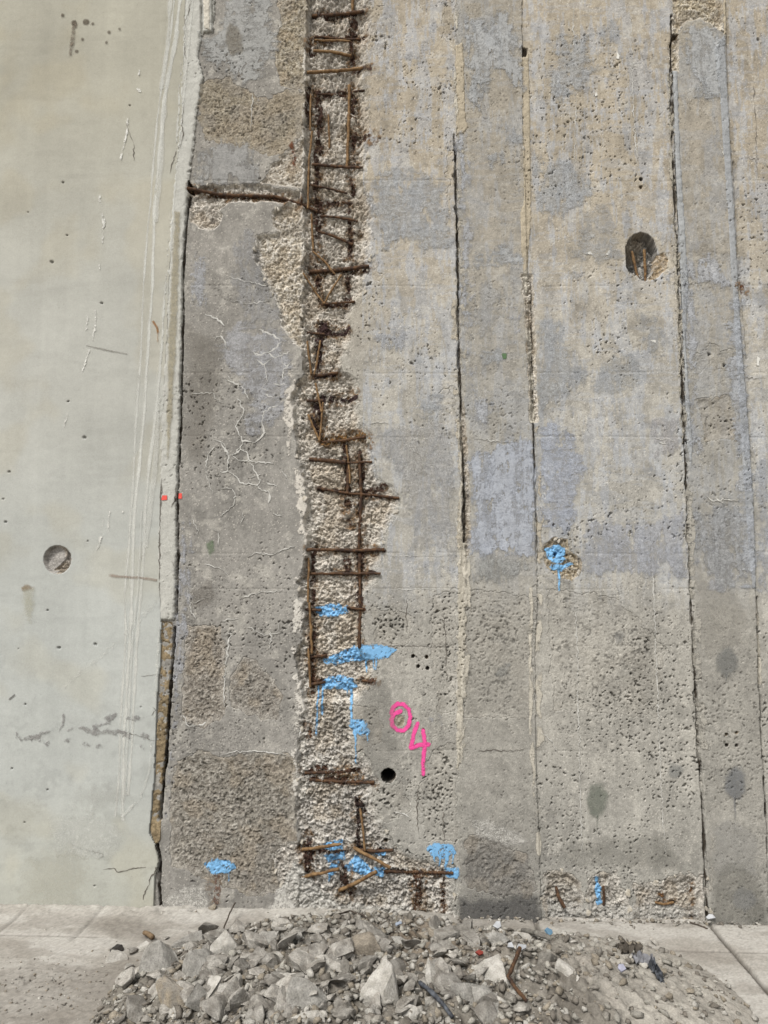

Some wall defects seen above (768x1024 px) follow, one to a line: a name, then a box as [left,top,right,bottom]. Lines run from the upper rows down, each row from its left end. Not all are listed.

crack [170,105,184,172]
crack [454,144,462,412]
crack [126,196,290,818]
spalling [166,0,730,926]
crack [398,283,536,557]
crack [669,15,708,916]
rust [293,765,390,901]
rust [386,868,446,913]